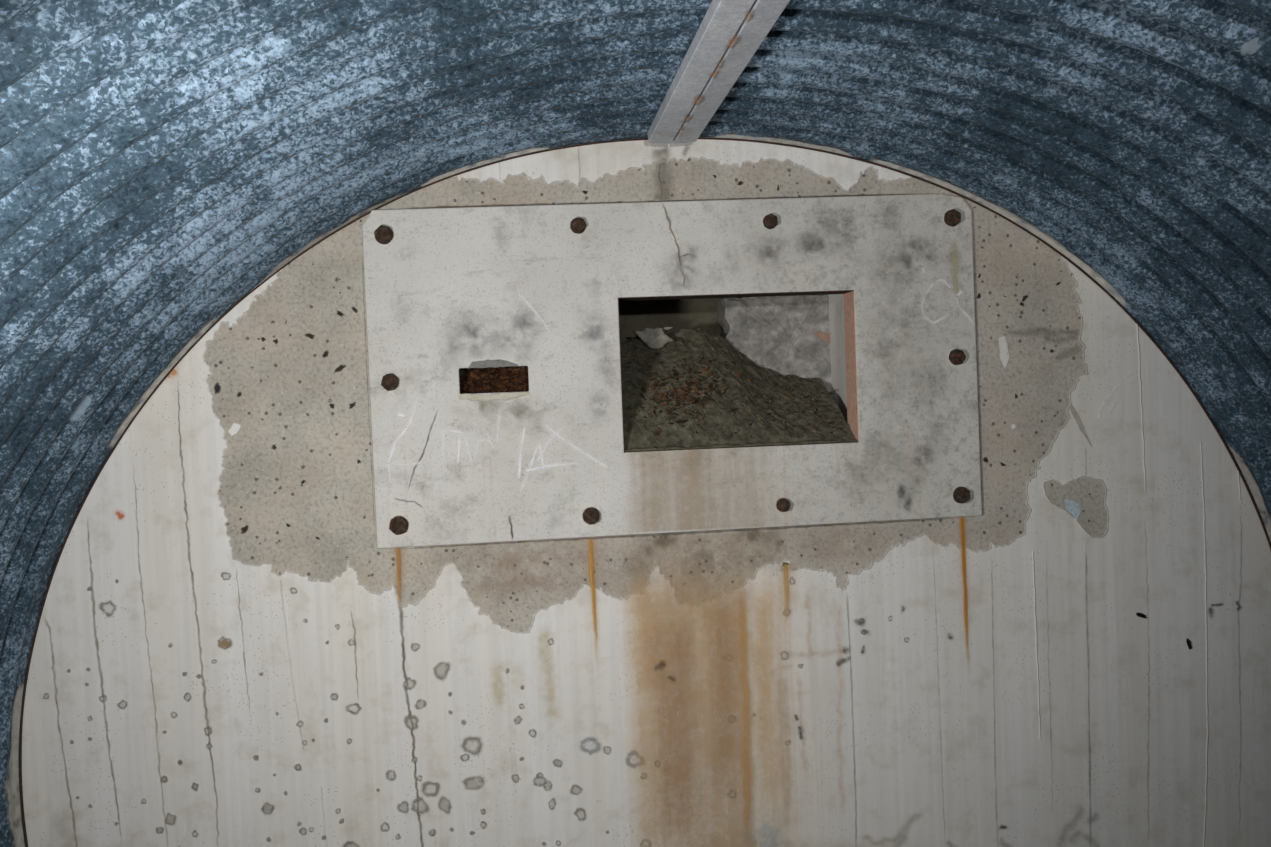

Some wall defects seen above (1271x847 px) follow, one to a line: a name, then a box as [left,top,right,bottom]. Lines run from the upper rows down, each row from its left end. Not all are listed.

crack [658,166,687,259]
peeling [203,157,1109,634]
crack [400,613,423,847]
corrosion [637,591,753,847]